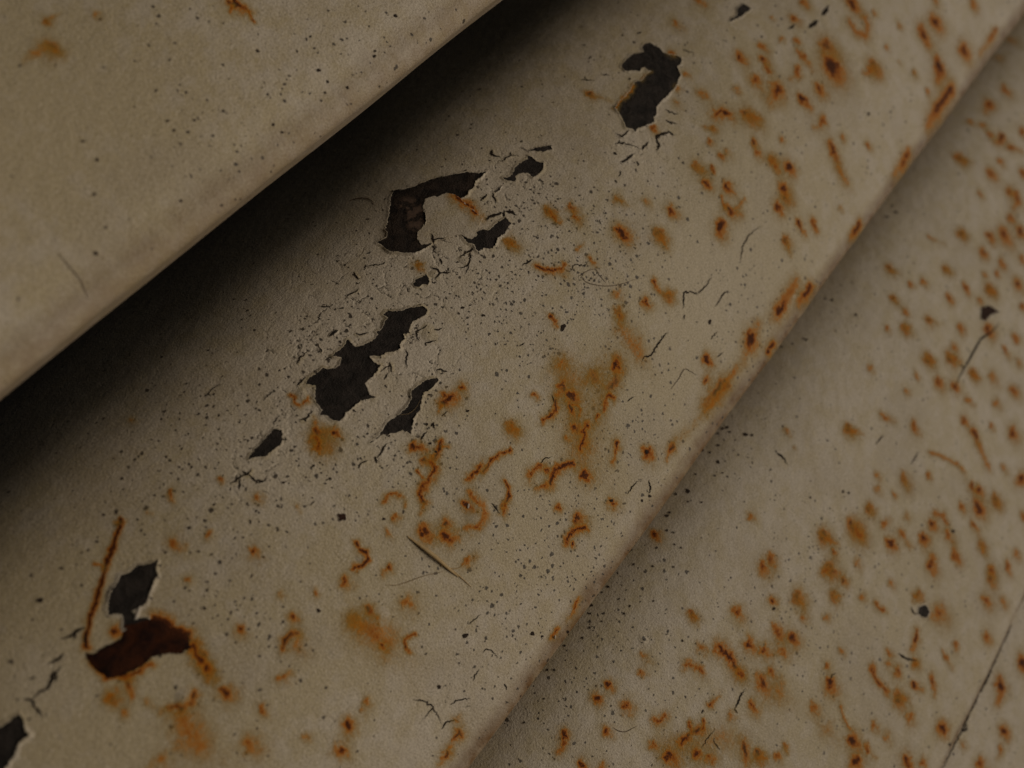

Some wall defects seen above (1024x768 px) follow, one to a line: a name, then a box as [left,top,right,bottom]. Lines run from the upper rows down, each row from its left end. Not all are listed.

peeling [611,41,684,134]
rust [736,37,847,129]
peeling [373,145,554,256]
rust [691,89,819,240]
peeling [302,303,430,424]
peeling [367,376,441,446]
rust [526,290,646,491]
rust [381,420,521,547]
rust [81,516,155,717]
peeling [86,558,192,678]
rust [683,589,806,714]
peeling [0,710,35,768]